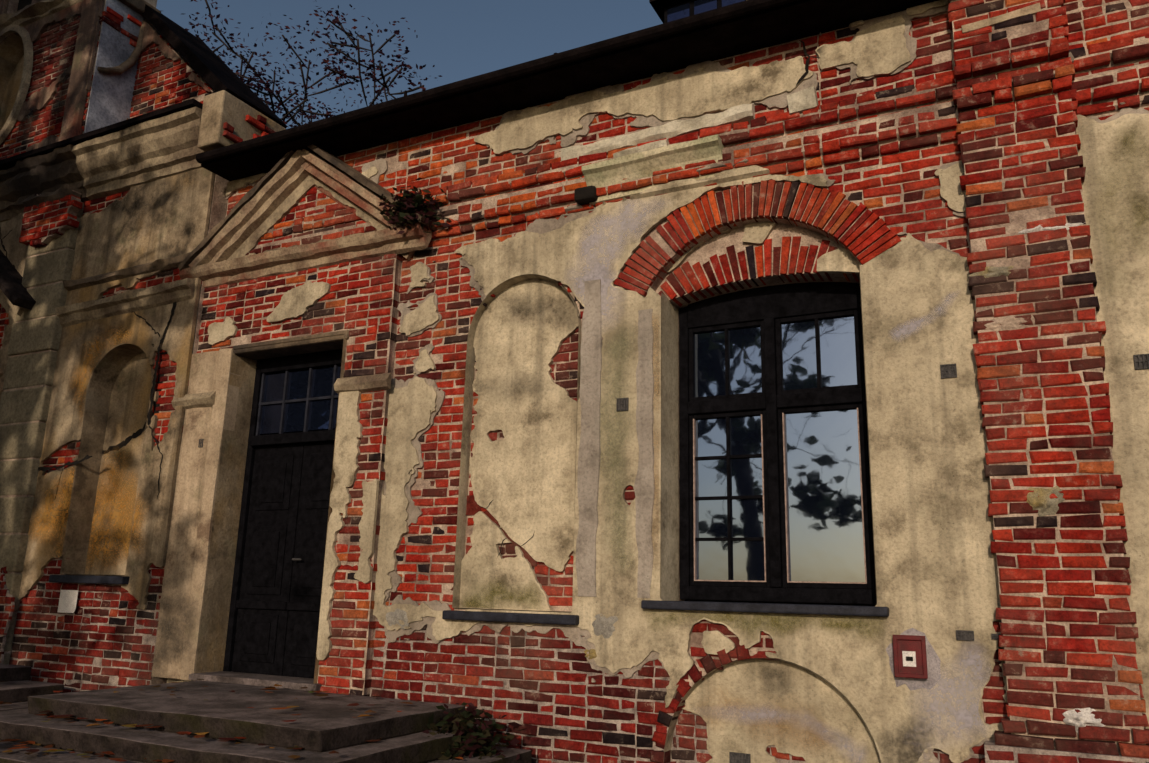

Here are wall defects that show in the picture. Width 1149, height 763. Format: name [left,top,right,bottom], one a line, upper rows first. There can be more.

spalling [0,15,81,160]
spalling [95,6,216,118]
crack [795,40,820,87]
spalling [19,190,129,248]
spalling [101,267,182,299]
crack [38,302,177,499]
spalling [153,344,191,445]
spalling [197,12,971,763]
spalling [41,441,80,475]
leakage [87,467,140,564]
crack [466,495,537,567]
spalling [0,554,167,693]